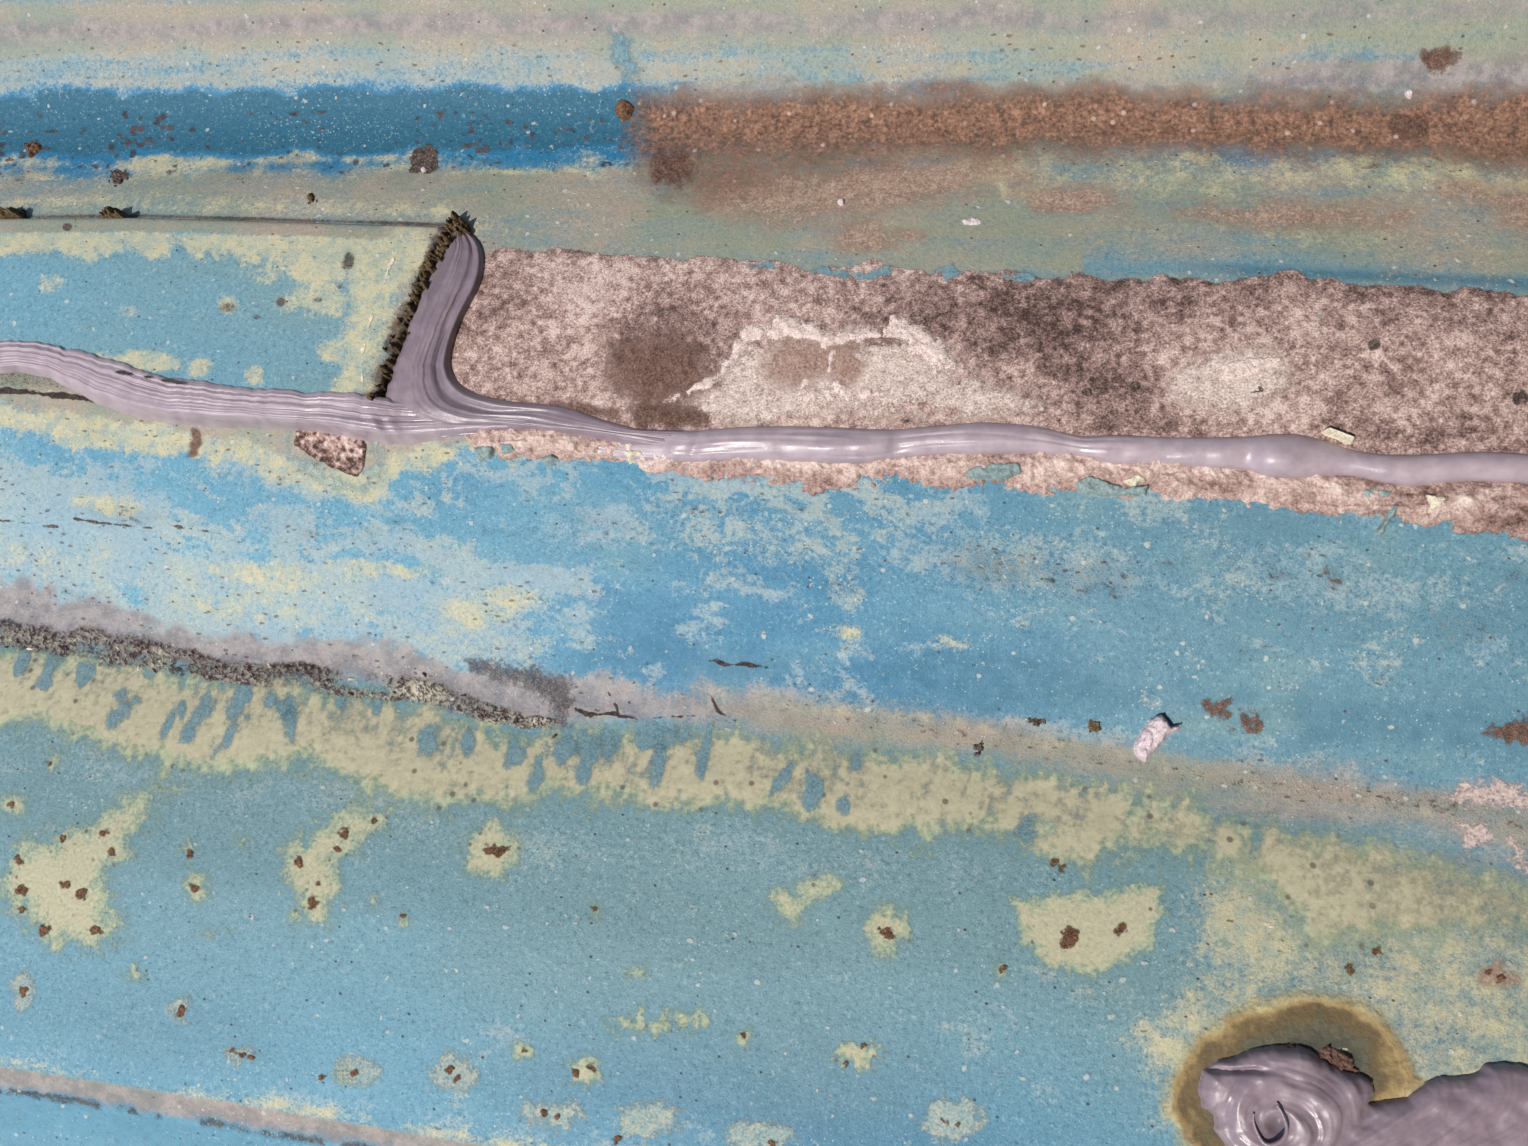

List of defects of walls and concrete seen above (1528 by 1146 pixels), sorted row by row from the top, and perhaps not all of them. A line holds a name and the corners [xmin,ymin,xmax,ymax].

corrosion [1420,46,1462,74]
corrosion [636,83,1528,250]
crack [360,252,397,385]
spalling [451,246,1528,542]
peeling [0,619,575,739]
corrosion [1483,719,1528,746]
peeling [0,783,182,954]
peeling [464,816,522,882]